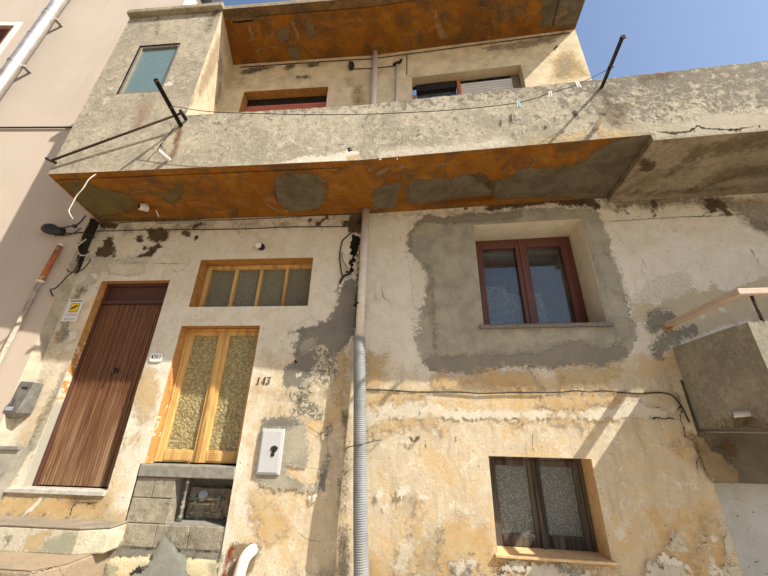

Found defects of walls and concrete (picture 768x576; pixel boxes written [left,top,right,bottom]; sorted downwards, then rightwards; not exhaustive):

crack [656,125,760,135]
leakage [633,158,657,172]
leakage [483,166,768,231]
peeling [280,316,321,350]
crack [651,393,712,482]
peeling [368,490,520,576]
peeling [643,516,743,576]